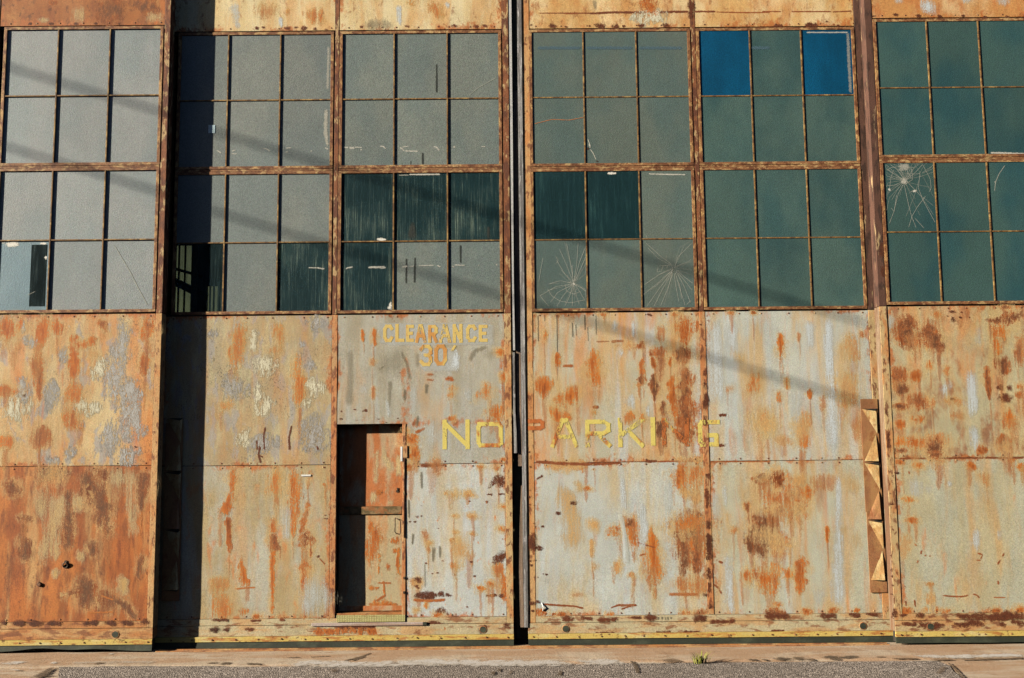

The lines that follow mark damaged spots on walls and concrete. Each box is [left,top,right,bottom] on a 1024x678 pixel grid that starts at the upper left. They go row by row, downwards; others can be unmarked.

peeling [2,376,60,427]
corrosion [0,316,107,431]
peeling [73,318,149,467]
corrosion [884,304,1024,487]
corrosion [53,466,116,557]
corrosion [68,575,150,627]
corrosion [208,467,326,633]
corrosion [313,618,378,636]
corrosion [363,488,477,630]
corrosion [492,550,507,601]
corrosion [527,310,877,632]
corrosion [891,582,1024,630]